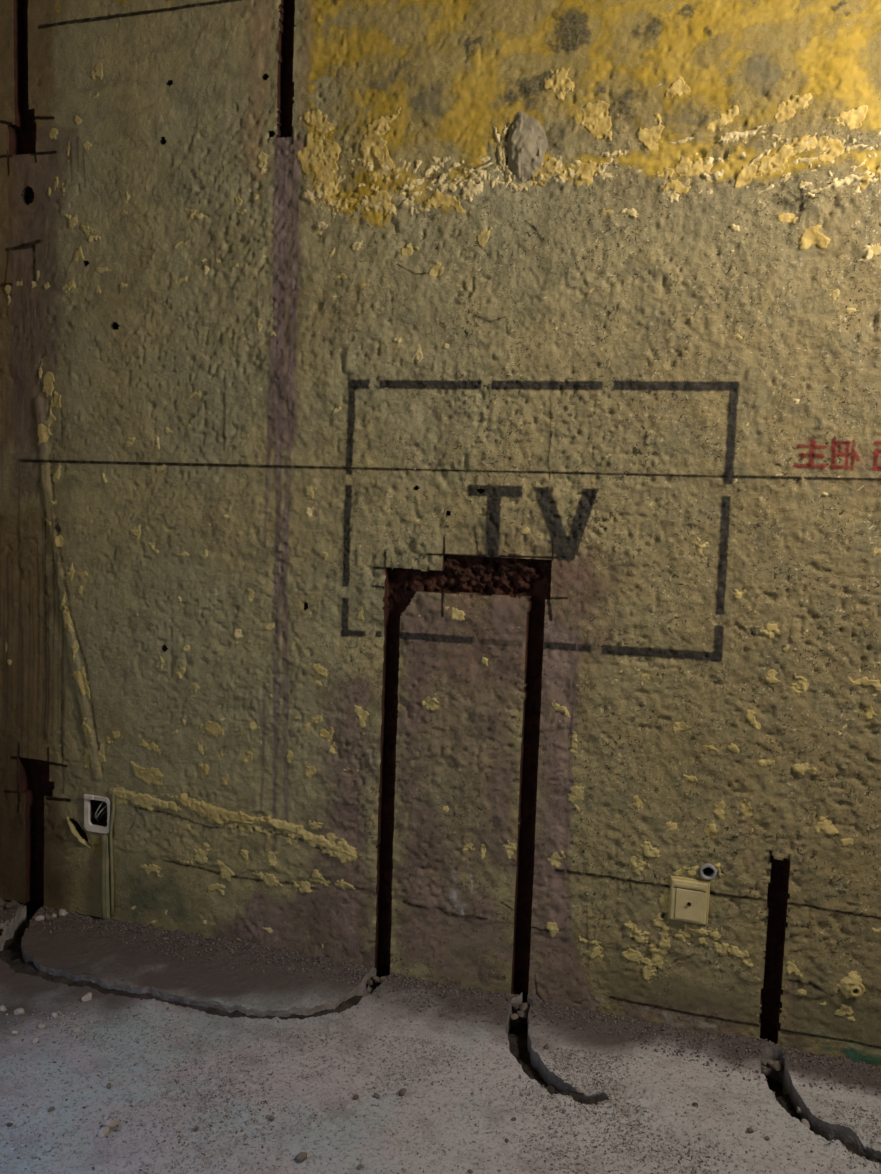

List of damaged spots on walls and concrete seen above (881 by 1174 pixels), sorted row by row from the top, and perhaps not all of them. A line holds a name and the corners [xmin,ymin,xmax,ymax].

peeling [297,0,881,250]
peeling [857,243,881,263]